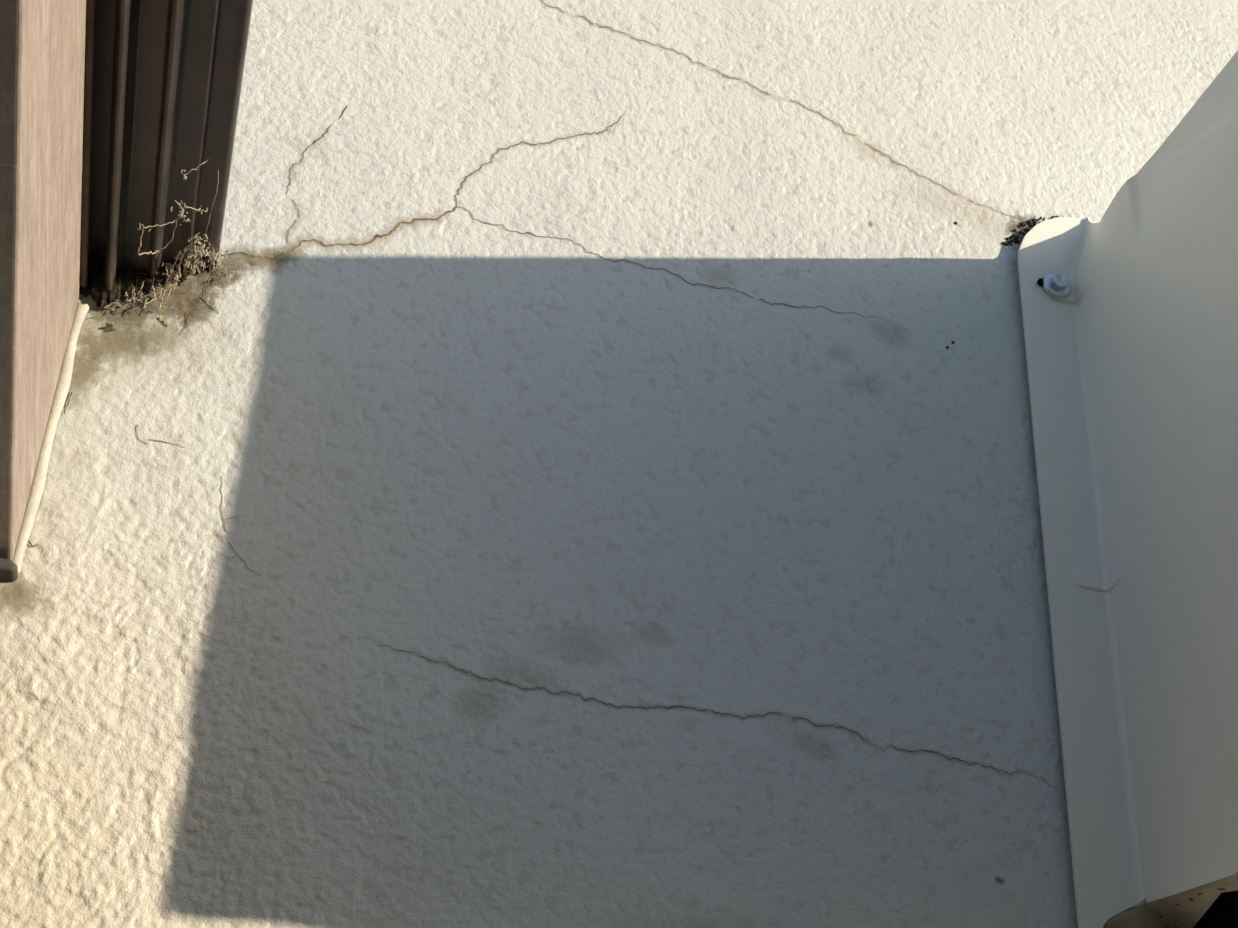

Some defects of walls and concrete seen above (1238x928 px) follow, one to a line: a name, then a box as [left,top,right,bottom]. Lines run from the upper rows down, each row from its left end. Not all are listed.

crack [542,1,1018,219]
water stain [94,261,240,344]
crack [181,105,872,334]
crack [380,645,1060,788]